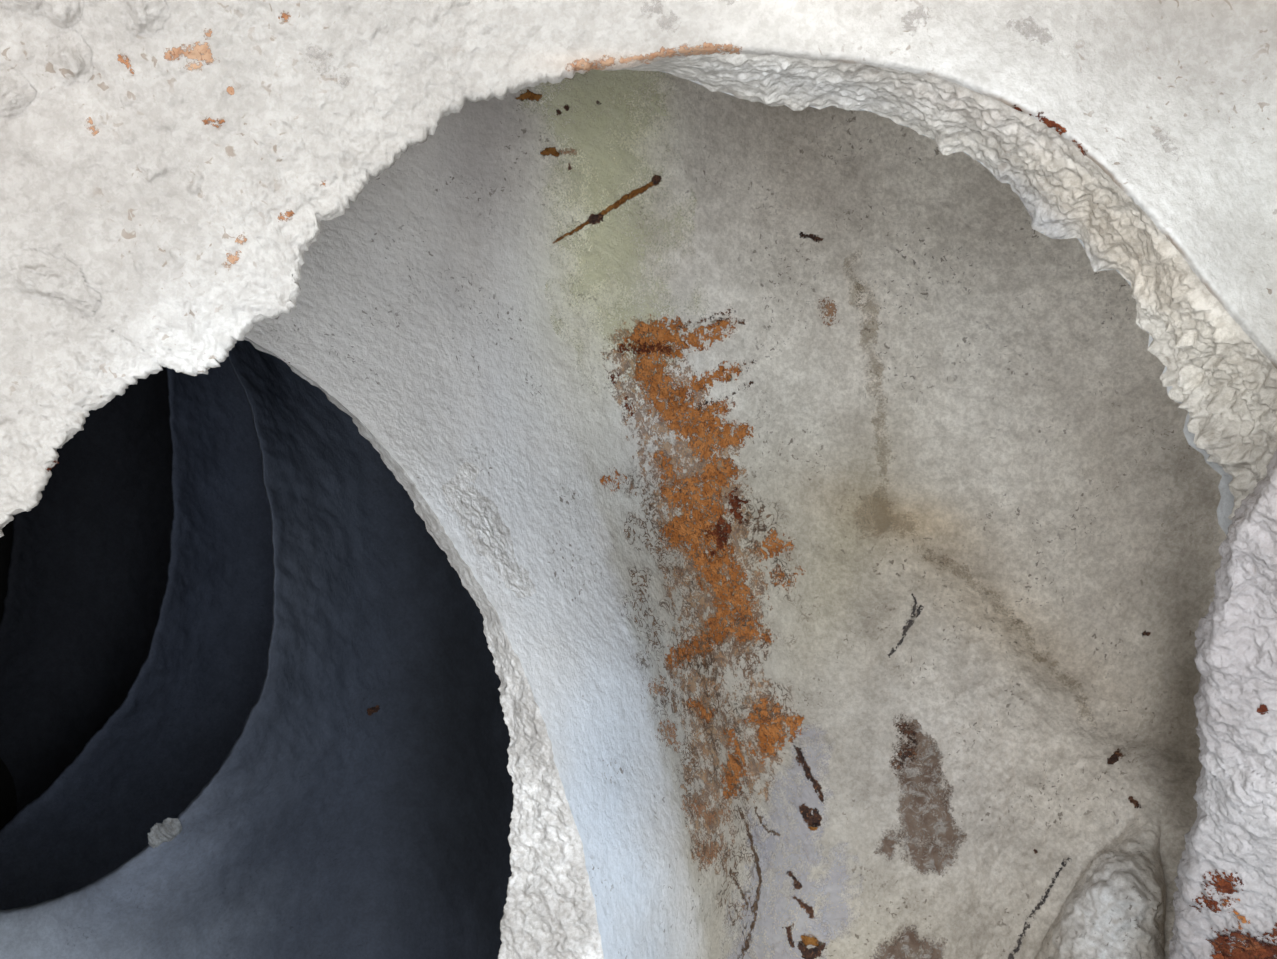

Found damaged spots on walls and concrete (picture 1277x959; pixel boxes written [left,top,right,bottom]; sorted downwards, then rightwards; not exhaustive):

corrosion [164,29,214,71]
corrosion [567,42,740,79]
corrosion [516,90,542,102]
corrosion [540,147,577,170]
corrosion [553,175,661,243]
corrosion [225,237,247,268]
spalling [441,462,537,598]
corrosion [595,304,806,875]
leakage [874,714,967,876]
corrosion [1189,869,1277,959]
leakage [870,925,945,959]